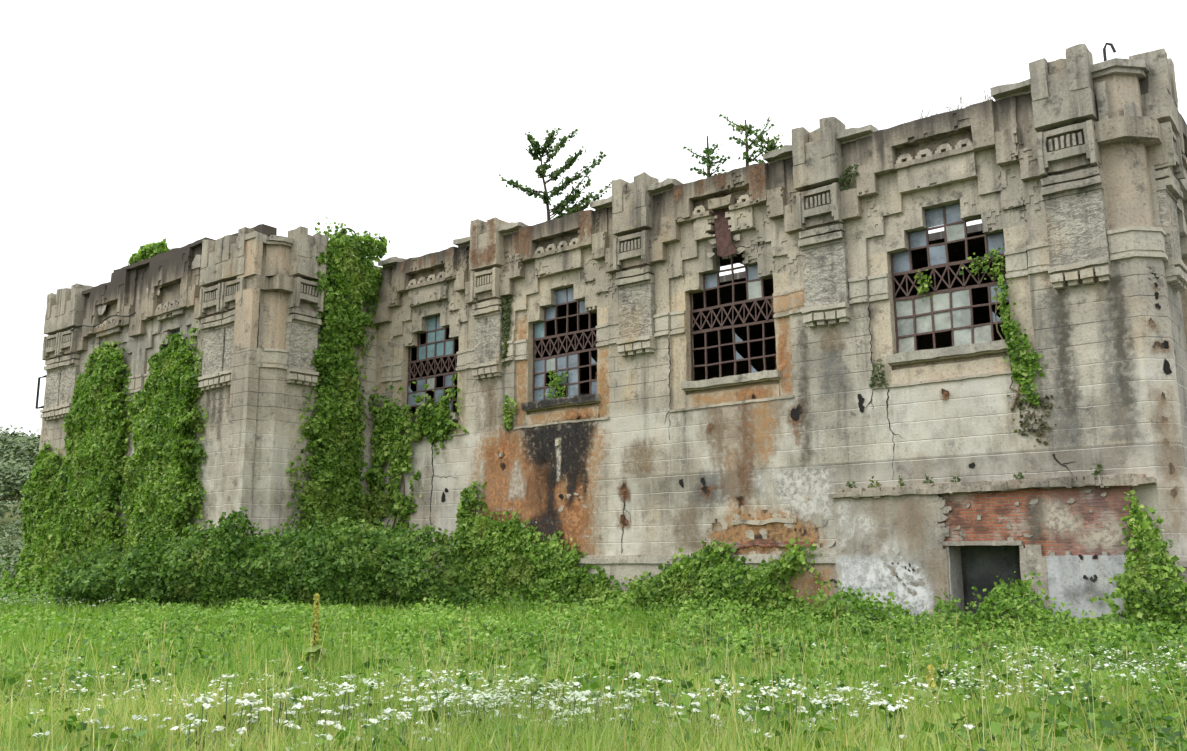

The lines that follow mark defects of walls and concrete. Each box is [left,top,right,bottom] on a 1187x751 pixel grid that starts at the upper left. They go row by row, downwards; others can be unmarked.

corrosion [471,350,609,553]
corrosion [693,289,804,511]
peeling [710,467,934,621]
crack [866,305,901,479]
flaking render [930,494,966,543]
flaking render [998,489,1123,608]
water stain [1050,290,1079,444]
water stain [1105,278,1138,440]